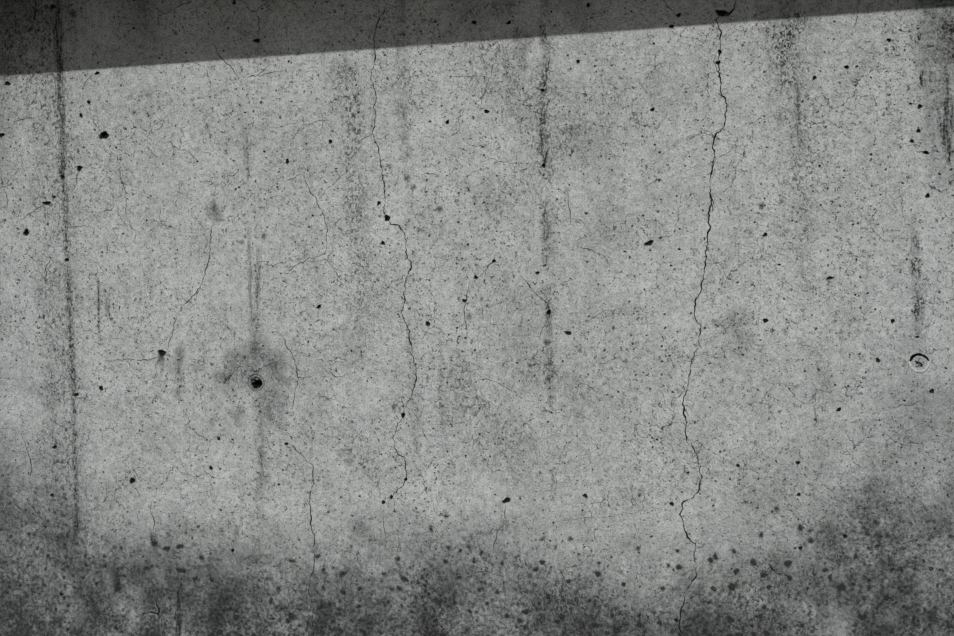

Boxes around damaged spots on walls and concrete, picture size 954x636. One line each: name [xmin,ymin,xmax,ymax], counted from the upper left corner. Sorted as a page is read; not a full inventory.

crack [360,1,417,550]
crack [678,1,736,636]
damp [0,491,493,636]
damp [505,562,712,636]
damp [727,507,954,636]